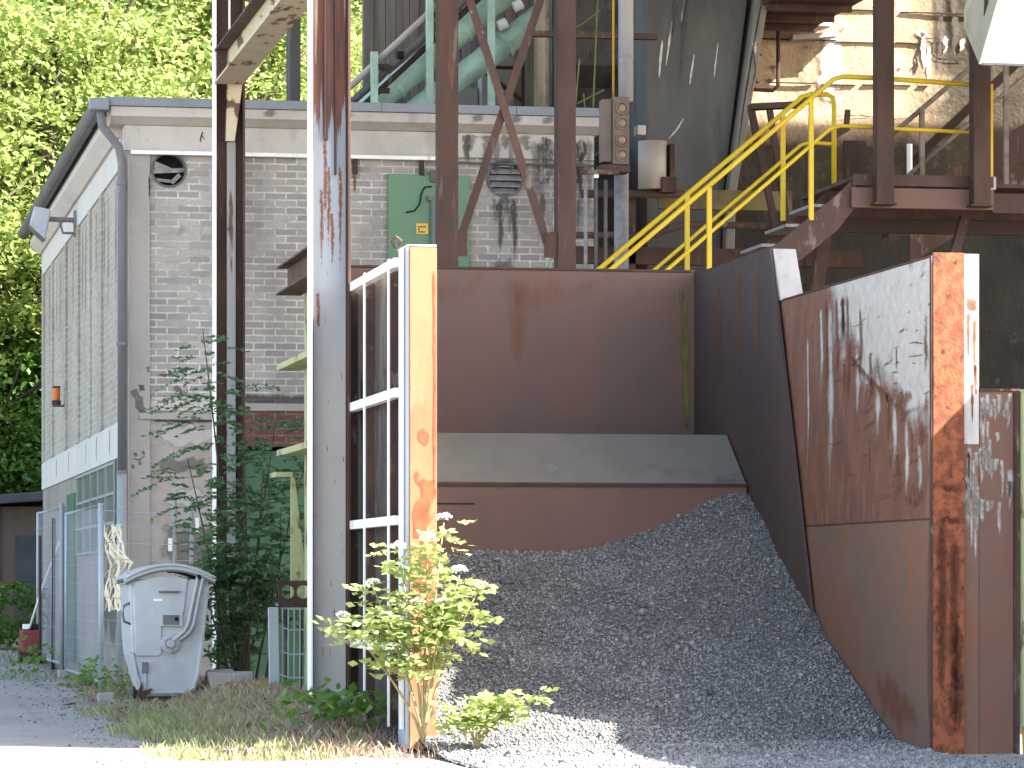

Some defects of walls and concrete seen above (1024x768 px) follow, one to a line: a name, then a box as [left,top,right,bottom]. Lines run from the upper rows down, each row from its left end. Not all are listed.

corrosion [320,144,356,262]
leakage [496,200,518,249]
leakage [538,137,554,231]
leakage [576,140,587,223]
spalling [131,385,148,420]
flaking render [158,424,212,447]
flaking render [167,488,207,507]
corrosion [413,273,436,626]
peeling [807,258,930,490]
corrosion [967,298,977,421]
peeling [964,394,1013,556]
corrosion [938,517,961,724]